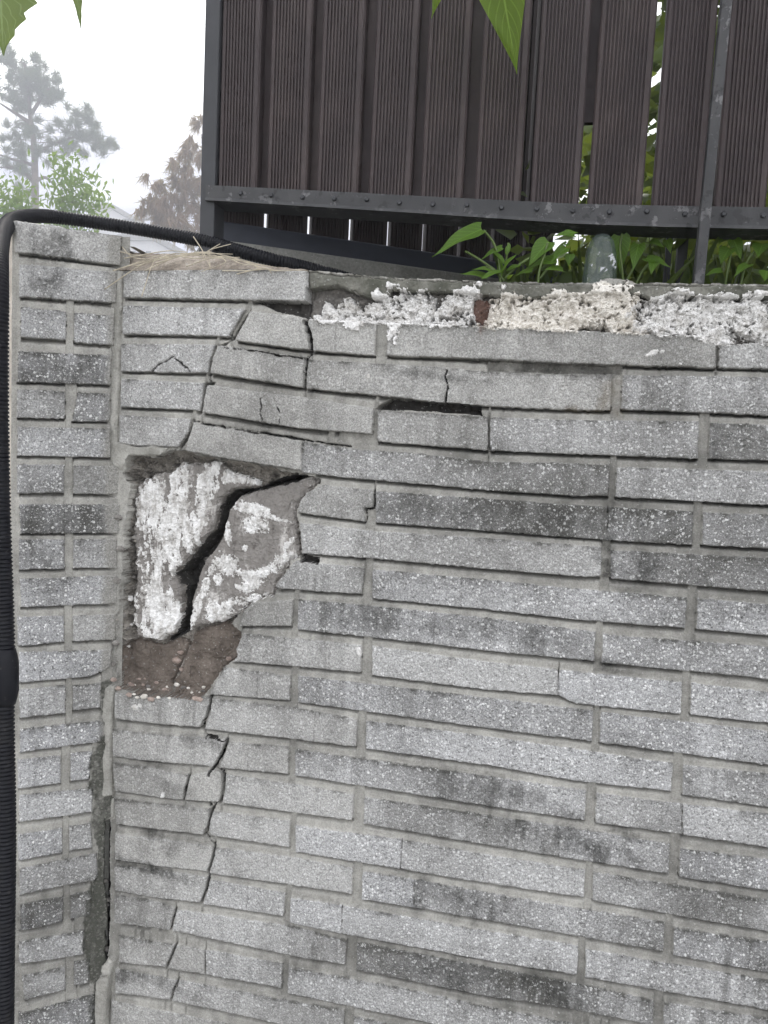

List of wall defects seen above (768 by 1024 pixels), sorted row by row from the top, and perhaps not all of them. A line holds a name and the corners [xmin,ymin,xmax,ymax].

flaking render [310,279,768,347]
crack [225,321,313,391]
crack [182,402,352,449]
spalling [110,451,321,702]
crack [185,695,229,901]